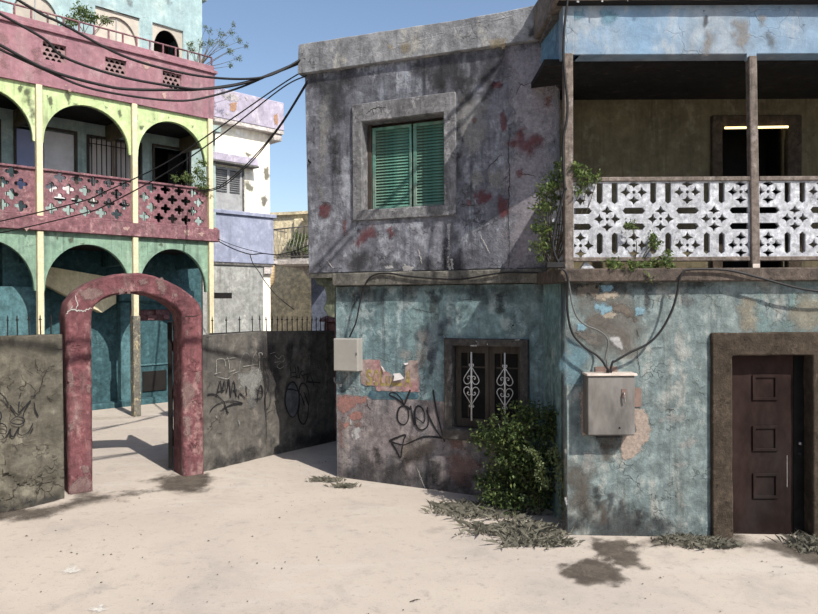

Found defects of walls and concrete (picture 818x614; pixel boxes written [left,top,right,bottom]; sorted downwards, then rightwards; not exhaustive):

damp [420,53,503,103]
peeling [467,28,557,269]
damp [443,223,464,271]
crack [24,359,54,417]
peeling [337,384,367,447]
peeling [621,408,652,460]
damp [0,492,108,520]
damp [560,494,671,587]
damp [715,533,818,564]